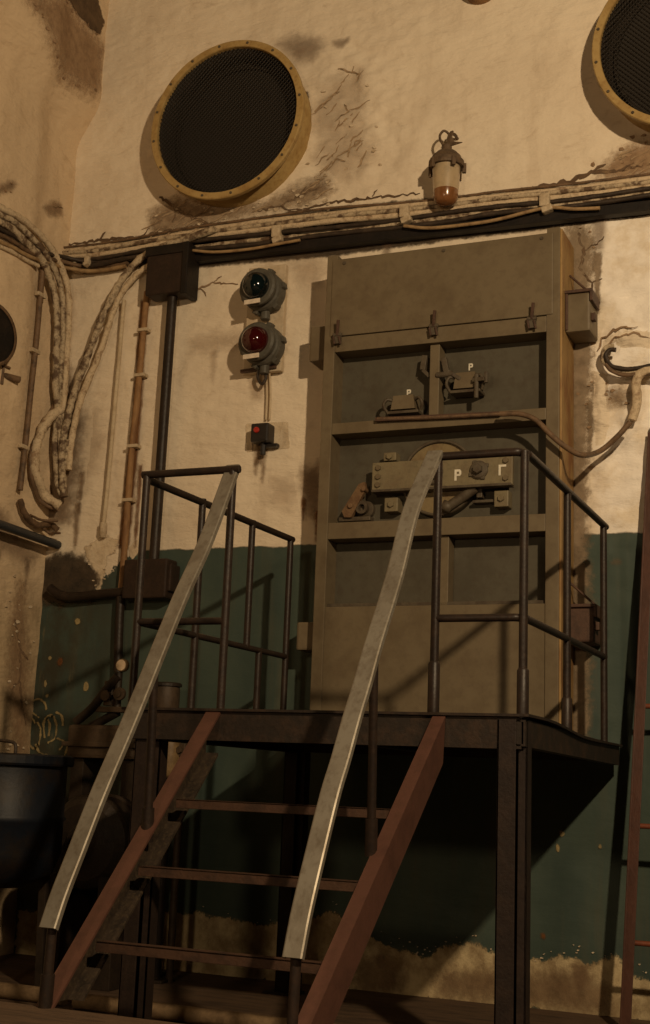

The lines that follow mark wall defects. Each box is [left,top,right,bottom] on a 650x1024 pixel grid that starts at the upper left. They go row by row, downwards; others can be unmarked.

crack [578,232,604,289]
water stain [42,377,100,609]
peeling [161,906,278,981]
peeling [305,904,342,961]
peeling [348,931,495,1004]
peeling [530,944,650,1021]